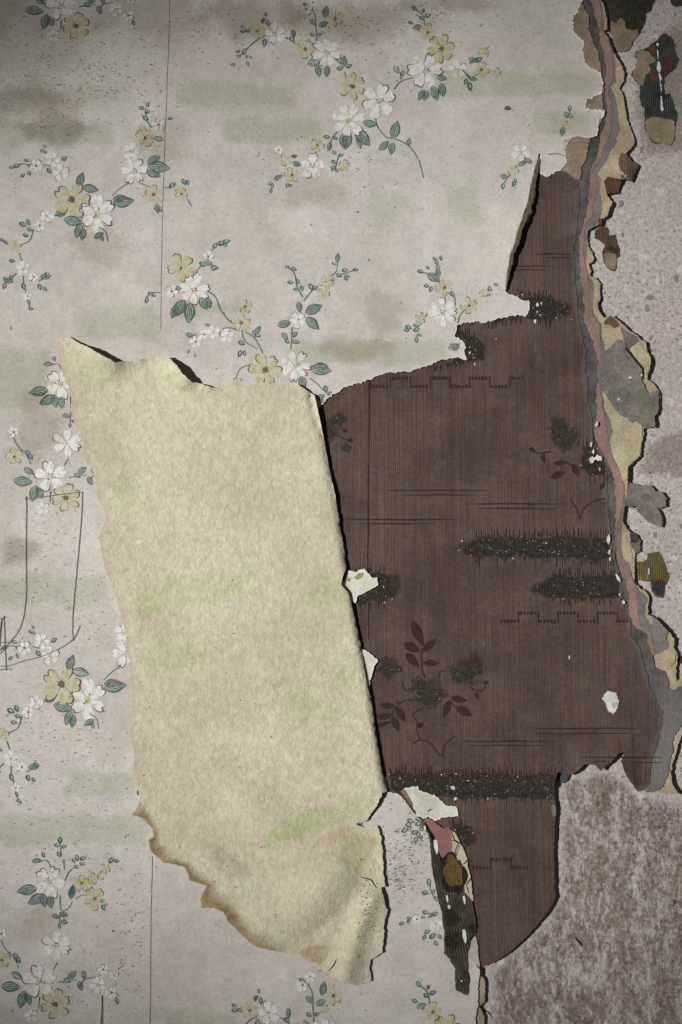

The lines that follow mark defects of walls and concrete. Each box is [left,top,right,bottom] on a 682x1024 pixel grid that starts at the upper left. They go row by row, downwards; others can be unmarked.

spalling [597,316,659,427]
spalling [625,482,667,527]
damp [458,526,623,609]
damp [358,766,556,948]